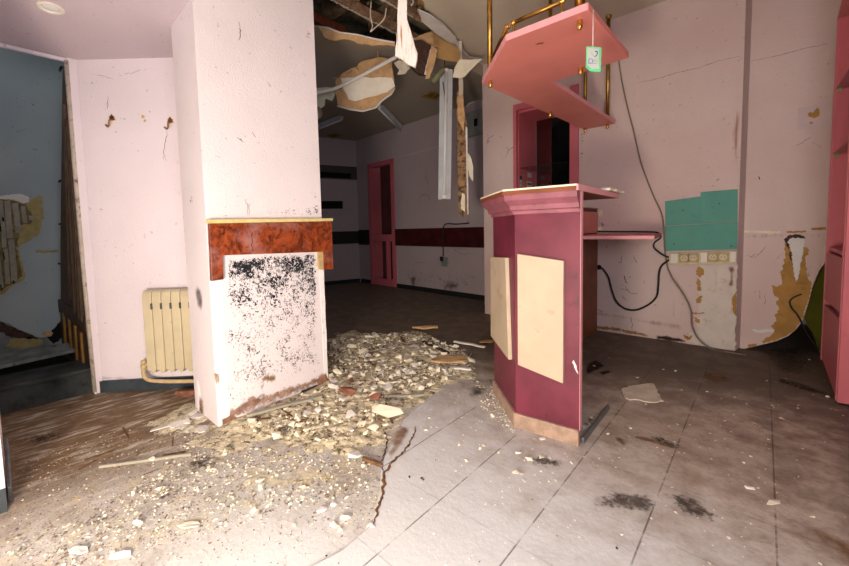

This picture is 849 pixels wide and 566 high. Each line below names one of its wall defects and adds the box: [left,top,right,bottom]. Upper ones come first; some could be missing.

peeling [331,0,397,36]
spalling [337,88,395,112]
flaking render [0,194,44,295]
leakage [222,253,328,425]
peeling [748,234,812,348]
crack [369,426,416,527]